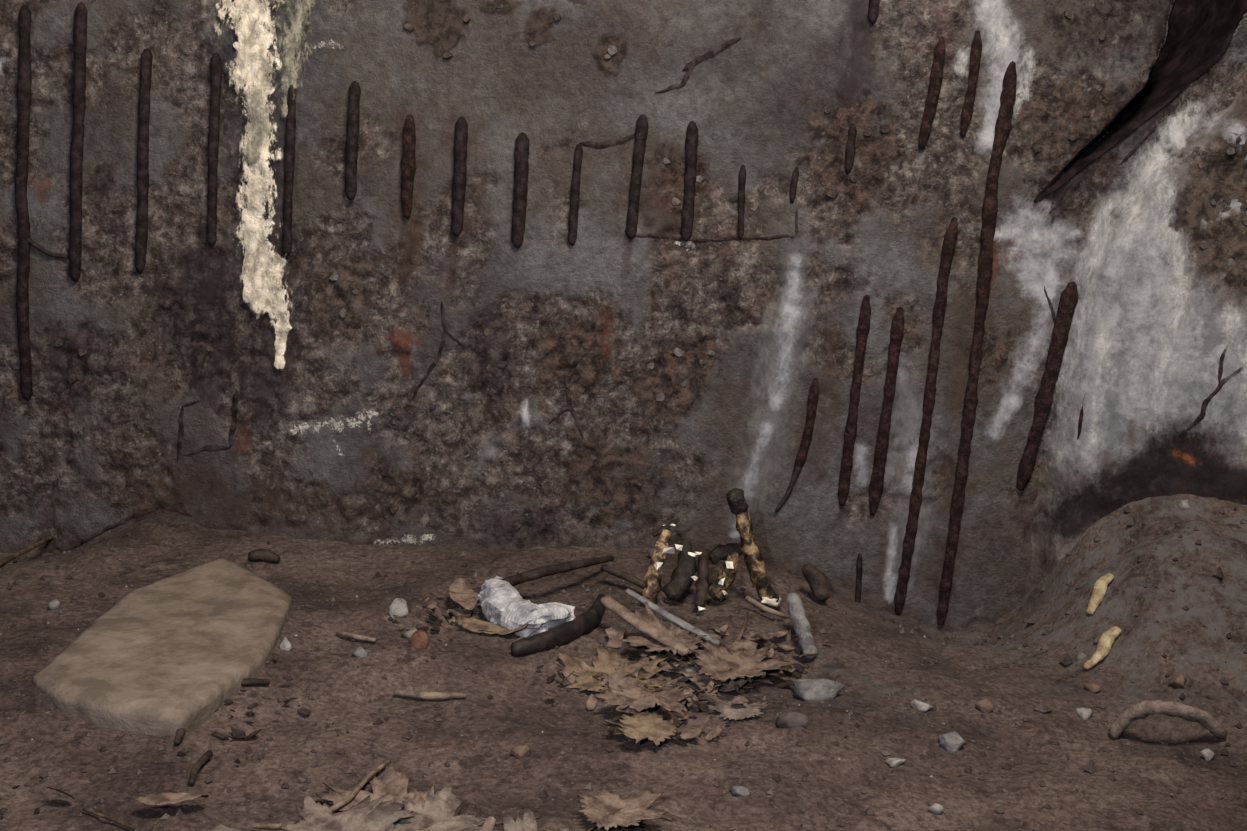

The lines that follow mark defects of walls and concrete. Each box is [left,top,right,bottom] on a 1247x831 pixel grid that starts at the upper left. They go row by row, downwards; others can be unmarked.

crack [655,37,741,93]
water stain [179,0,334,423]
spalling [648,145,715,213]
spalling [796,79,918,222]
water stain [986,93,1247,538]